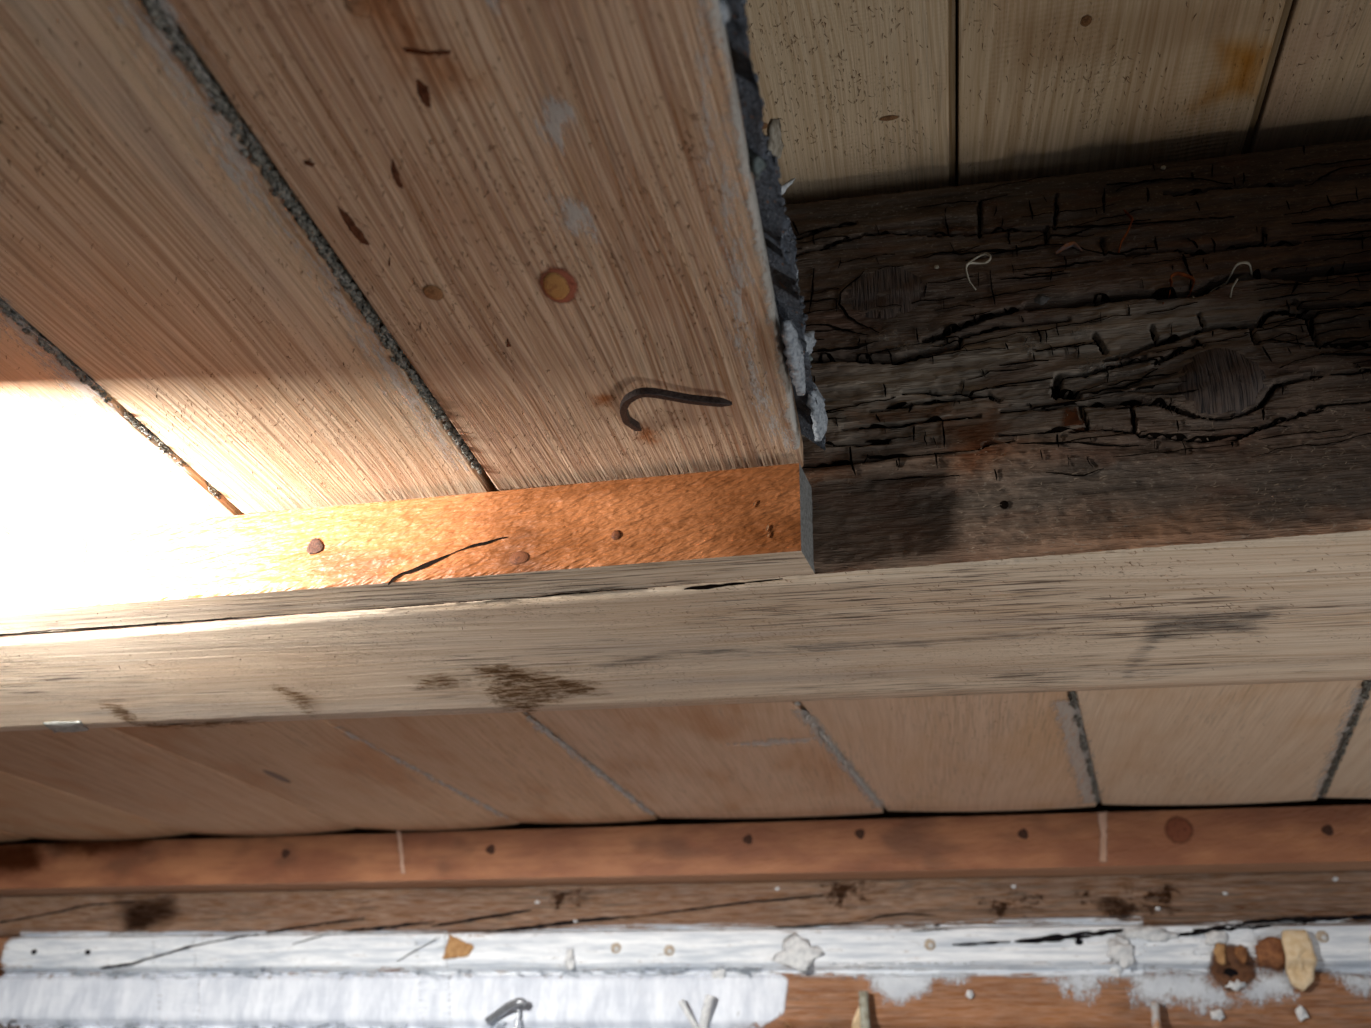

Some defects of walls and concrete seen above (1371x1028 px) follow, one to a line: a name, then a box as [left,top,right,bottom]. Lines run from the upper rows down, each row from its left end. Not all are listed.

crack [792,163,1371,481]
crack [367,537,648,610]
crack [684,579,780,590]
crack [0,614,294,636]